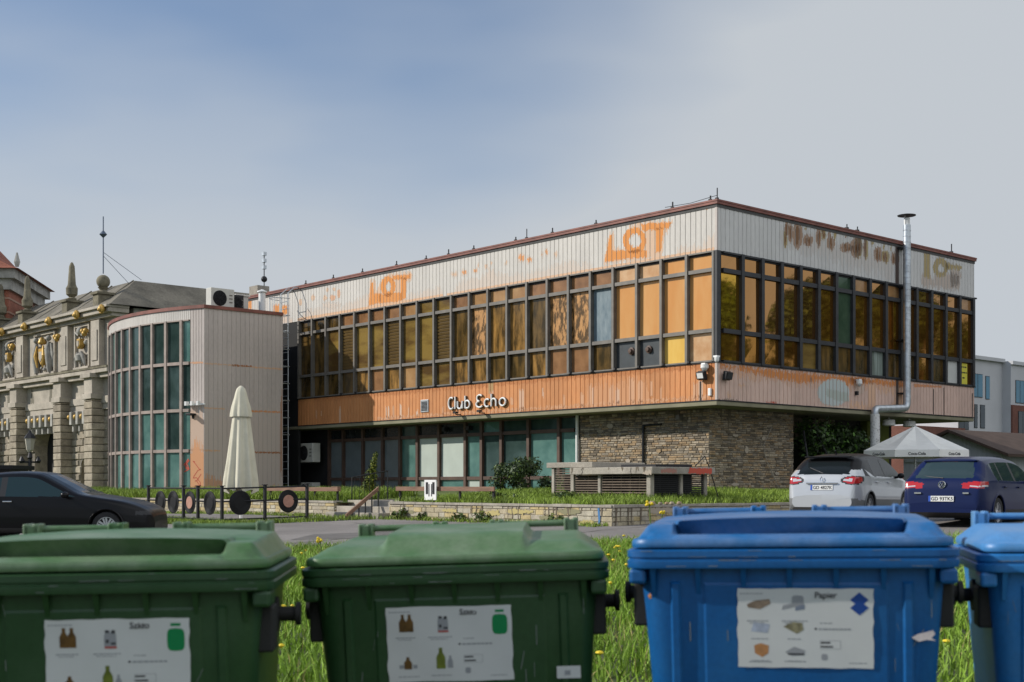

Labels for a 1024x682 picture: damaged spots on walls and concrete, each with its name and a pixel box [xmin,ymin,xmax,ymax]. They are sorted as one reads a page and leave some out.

rust [784,222,896,265]